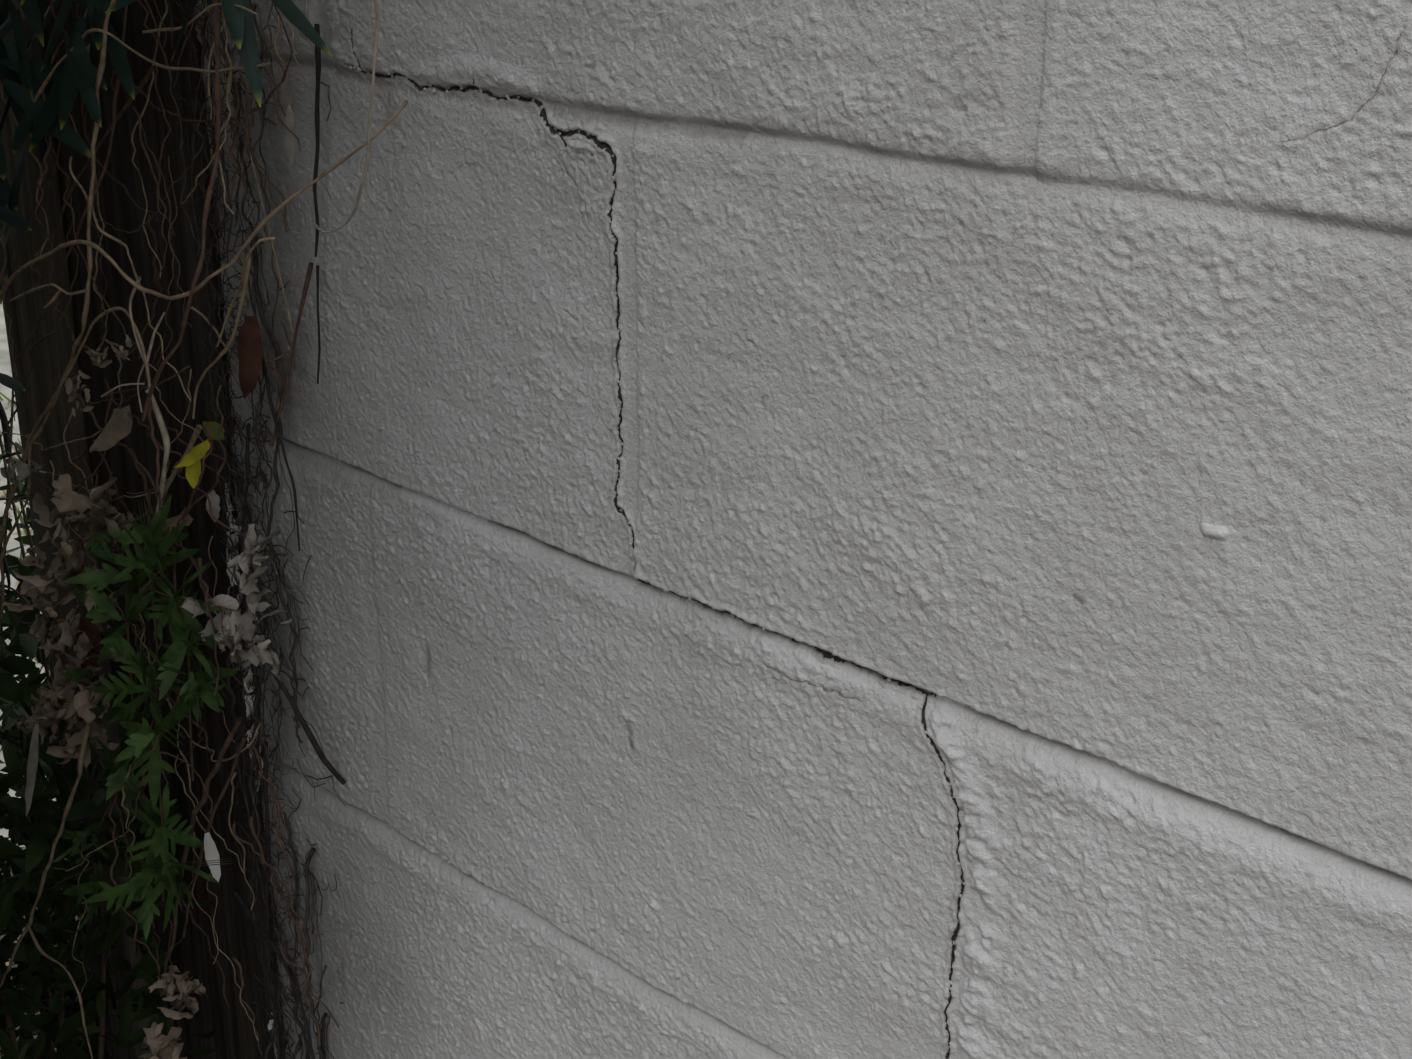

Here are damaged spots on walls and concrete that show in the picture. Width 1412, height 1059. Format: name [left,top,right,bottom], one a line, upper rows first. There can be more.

crack [343,28,965,1059]